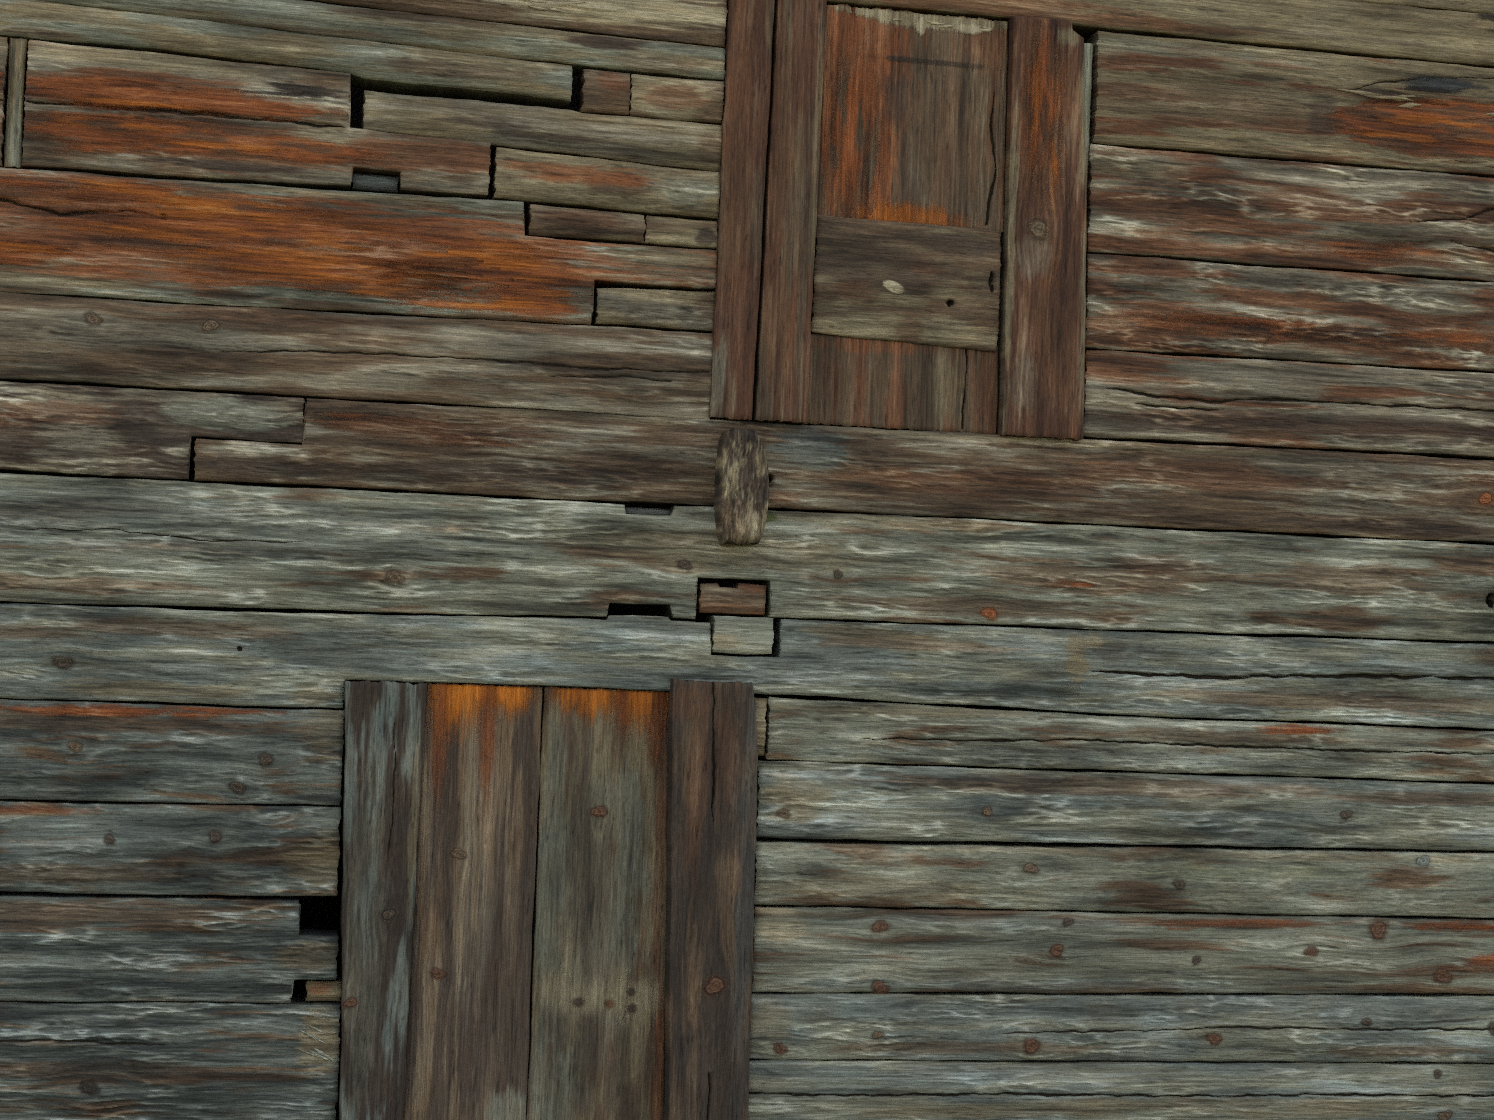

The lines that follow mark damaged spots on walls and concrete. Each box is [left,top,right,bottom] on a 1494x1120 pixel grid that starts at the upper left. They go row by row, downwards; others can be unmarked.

crack [1353,77,1494,105]
crack [0,198,152,216]
corrosion [862,205,945,225]
corrosion [432,684,530,783]
corrosion [556,688,669,755]